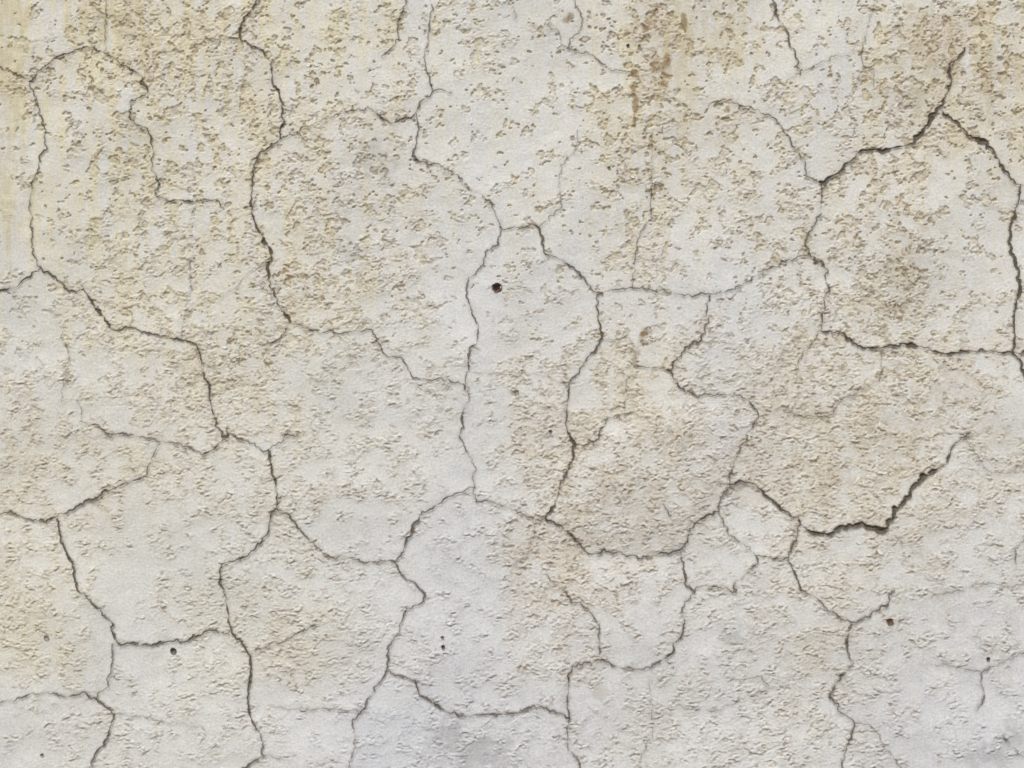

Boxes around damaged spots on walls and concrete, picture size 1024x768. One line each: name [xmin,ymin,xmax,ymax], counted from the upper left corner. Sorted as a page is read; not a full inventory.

crack [0,218,202,363]
crack [0,46,221,207]
crack [0,372,685,768]
crack [206,0,1024,768]